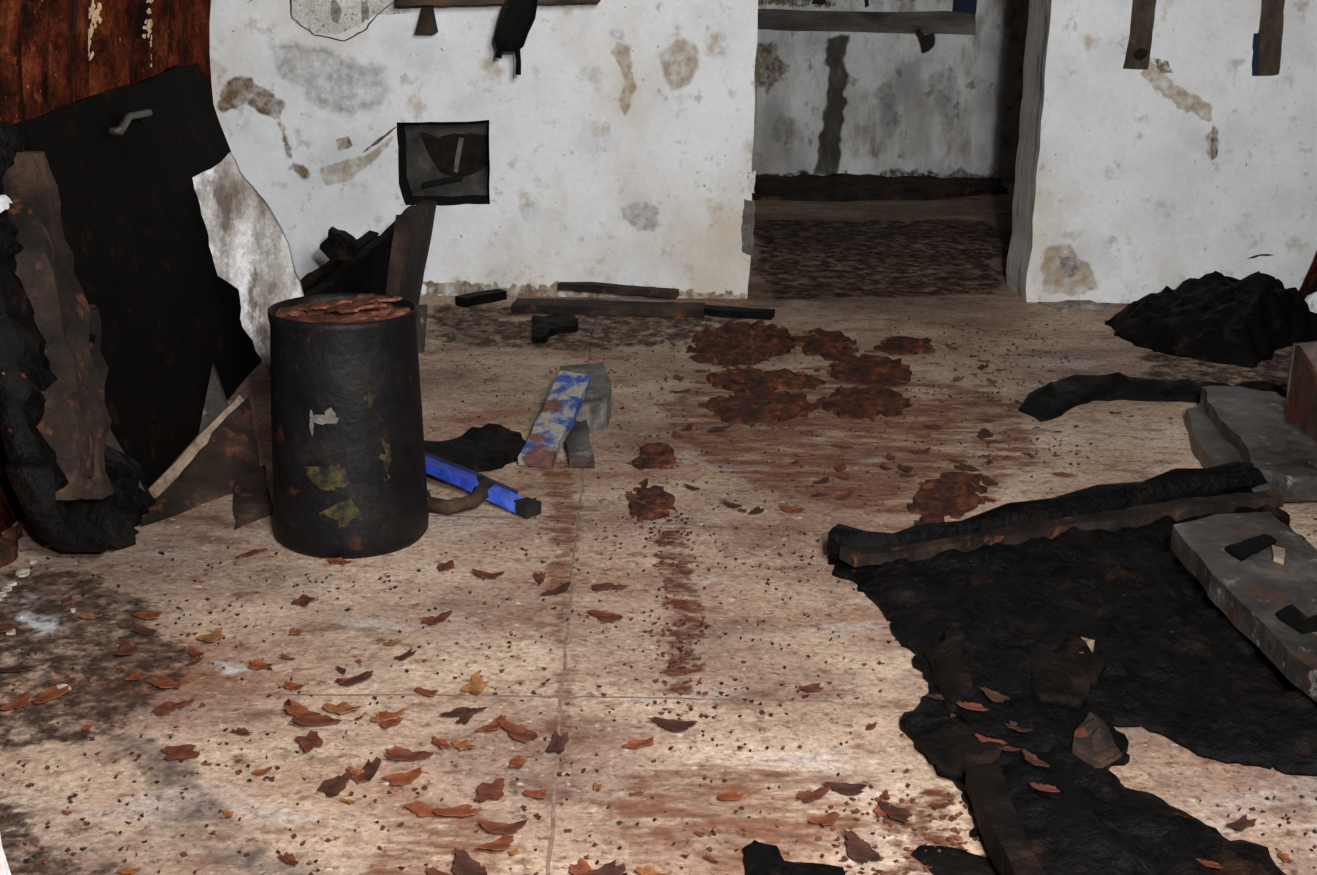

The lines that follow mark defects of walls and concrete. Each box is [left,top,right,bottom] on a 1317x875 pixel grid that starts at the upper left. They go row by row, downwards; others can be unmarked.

spalling [290,0,406,41]
water stain [774,35,849,176]